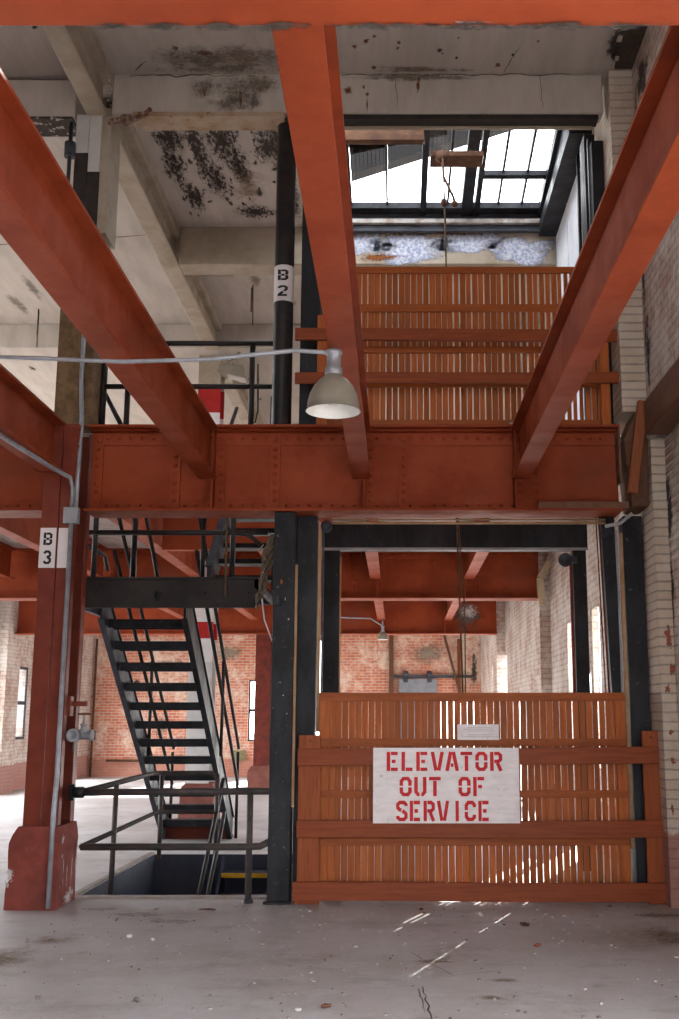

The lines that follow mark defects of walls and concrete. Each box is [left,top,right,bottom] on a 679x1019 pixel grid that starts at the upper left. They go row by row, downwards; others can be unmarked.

water stain [169,47,277,110]
crack [341,45,600,109]
peeling [354,233,556,266]